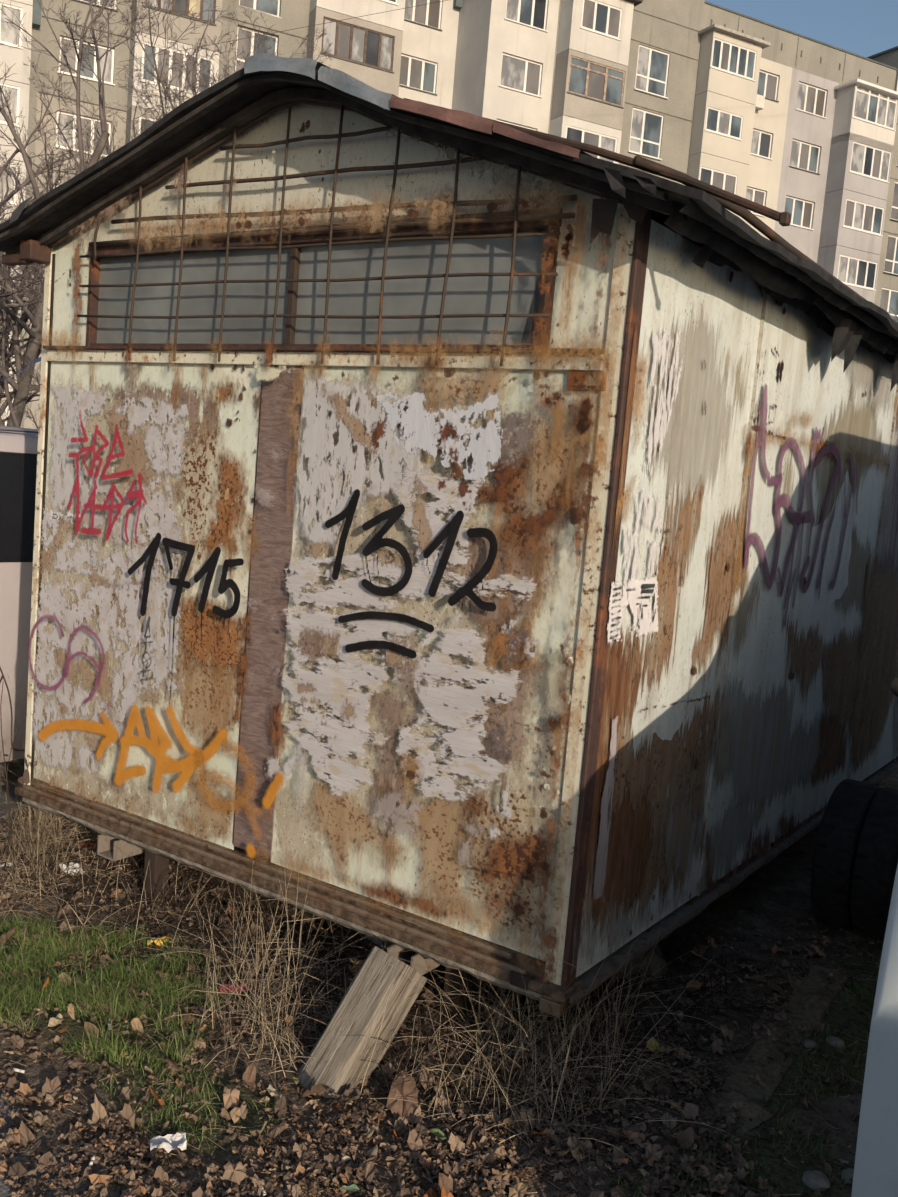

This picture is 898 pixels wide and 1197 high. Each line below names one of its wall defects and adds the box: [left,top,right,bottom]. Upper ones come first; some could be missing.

rust [126,177,457,243]
rust [42,195,131,349]
peeling [226,365,260,427]
rust [253,390,261,432]
rust [264,340,276,367]
rust [420,337,507,411]
rust [451,179,898,947]
rust [282,691,574,984]